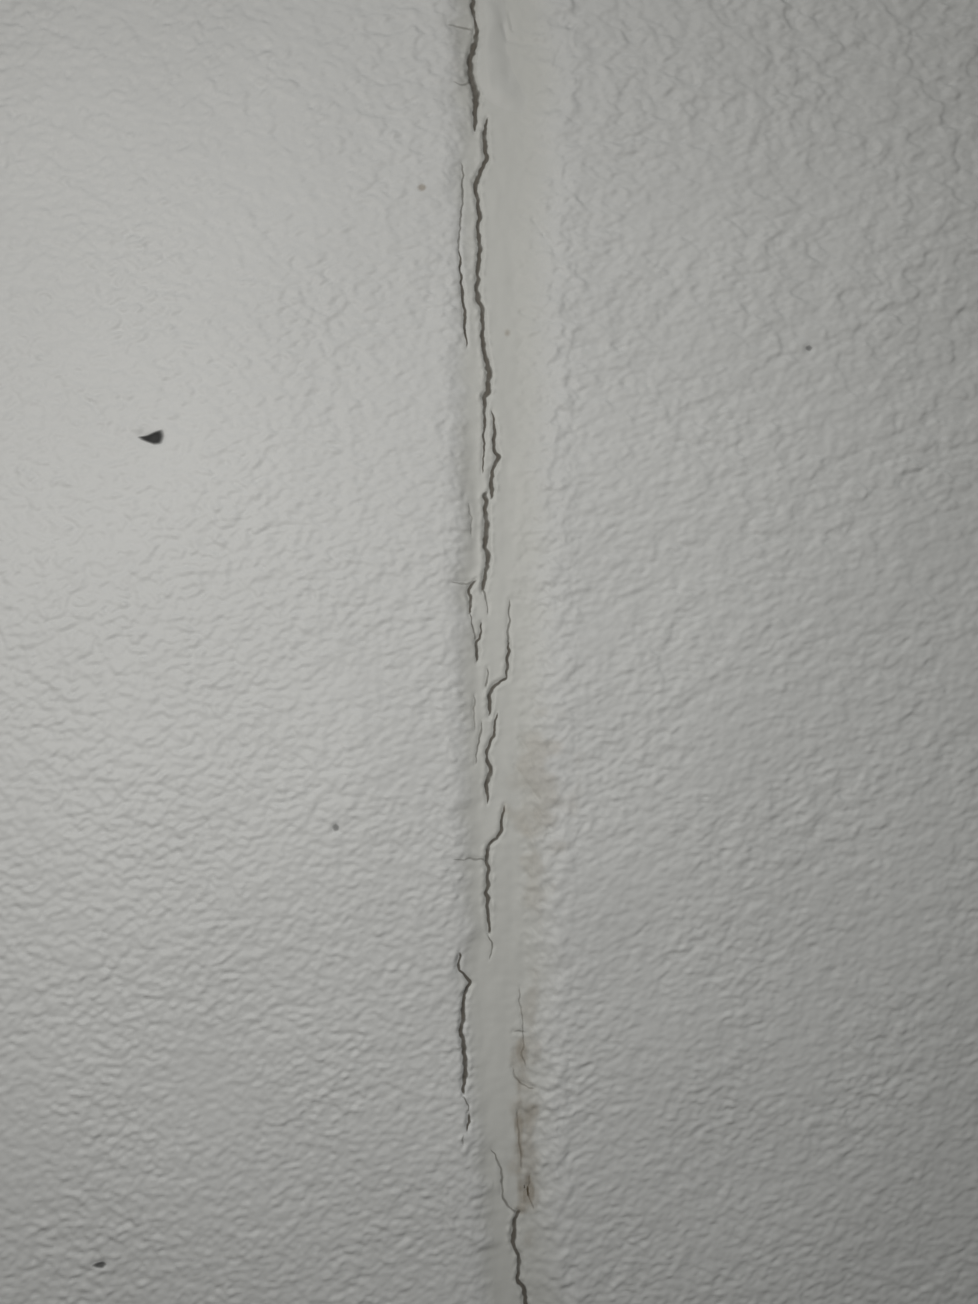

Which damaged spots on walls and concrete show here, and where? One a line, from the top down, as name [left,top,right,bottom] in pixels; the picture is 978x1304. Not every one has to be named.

crack [458,0,511,932]
crack [457,954,471,1130]
crack [511,1211,527,1304]